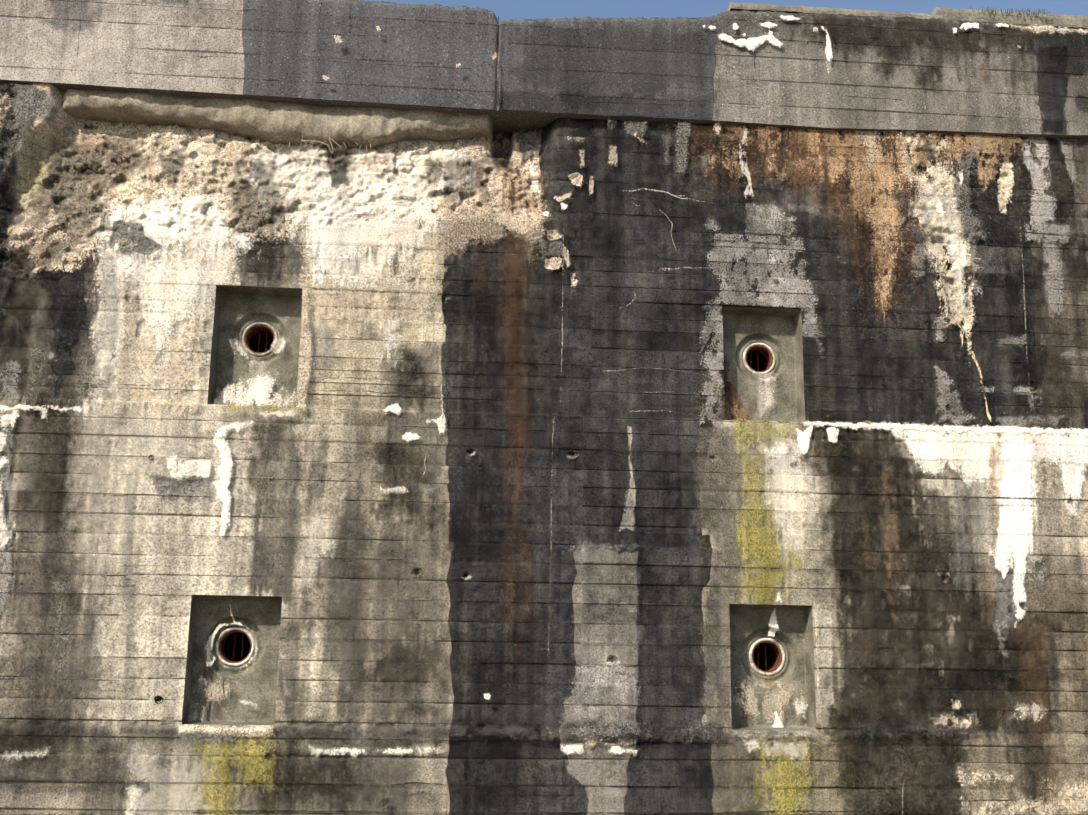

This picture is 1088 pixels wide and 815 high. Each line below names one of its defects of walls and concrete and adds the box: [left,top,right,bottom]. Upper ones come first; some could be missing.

spalling [0,83,577,311]
spalling [554,137,594,209]
spalling [608,146,617,164]
spalling [608,117,646,142]
spalling [663,121,690,173]
corrosion [709,123,910,309]
corrosion [930,132,1022,213]
spalling [218,287,312,416]
damp [242,0,1088,815]
spalling [0,408,18,547]
spalling [151,475,211,496]
damp [0,215,436,730]